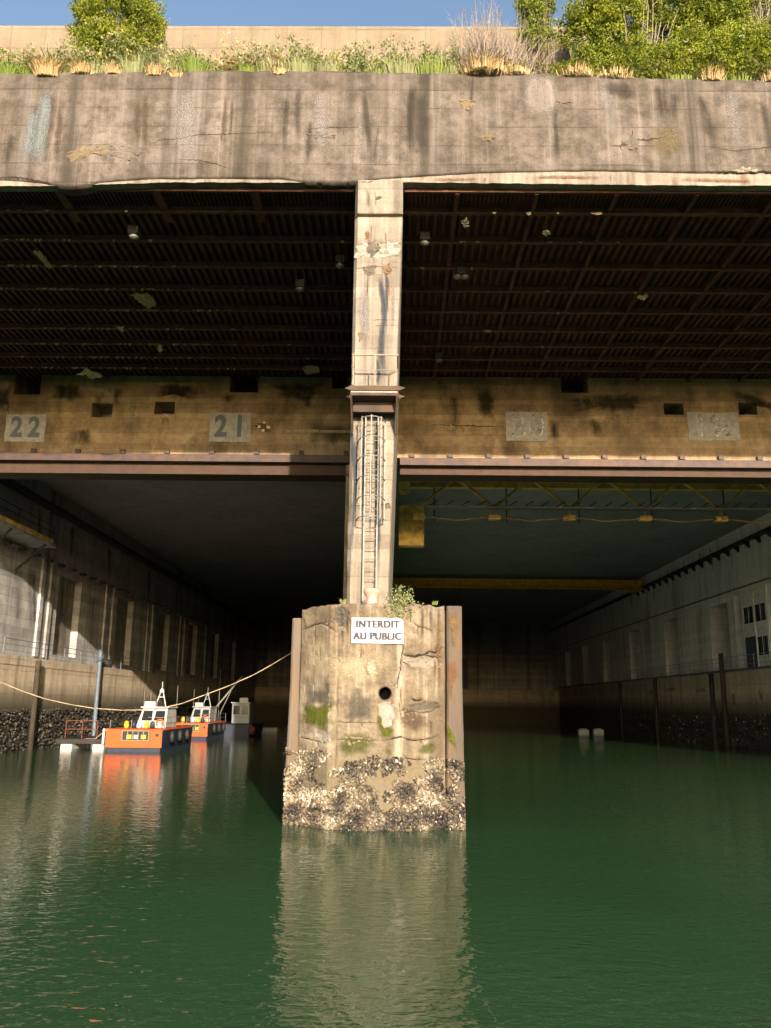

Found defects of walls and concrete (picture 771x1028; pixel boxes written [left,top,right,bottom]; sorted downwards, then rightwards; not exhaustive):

leakage [27,97,60,152]
leakage [408,94,426,141]
spalling [66,145,109,162]
peeling [4,239,77,269]
spalling [354,242,401,276]
peeling [36,288,178,312]
leakage [377,276,388,381]
spalling [378,702,395,728]
spalling [409,700,440,711]